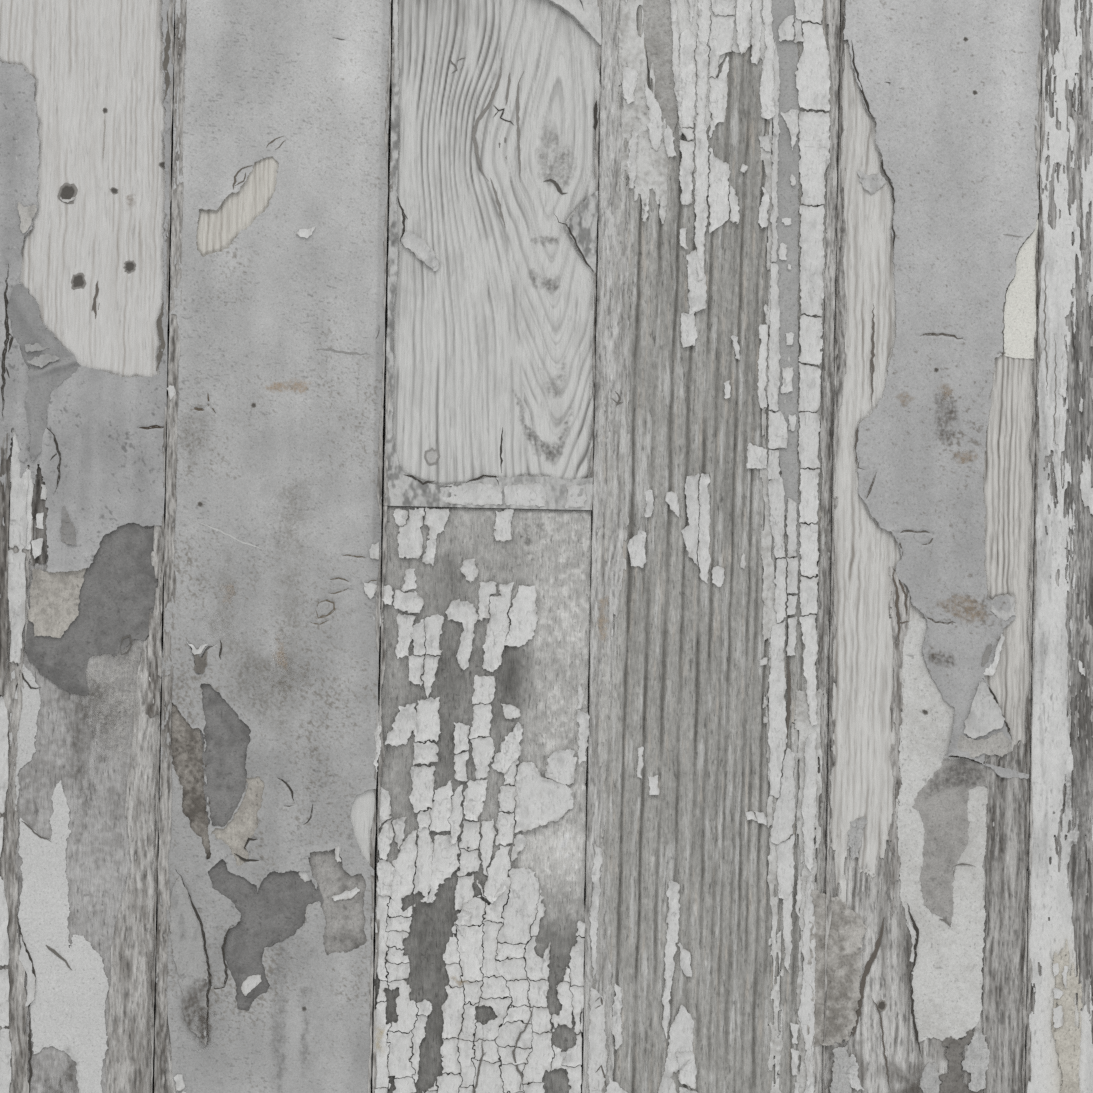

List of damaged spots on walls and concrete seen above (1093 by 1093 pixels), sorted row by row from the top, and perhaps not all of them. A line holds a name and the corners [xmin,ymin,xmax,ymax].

peeling [0,0,170,378]
peeling [0,428,158,1093]
peeling [171,0,627,1093]
crack [472,1037,485,1093]
crack [512,1005,534,1092]
peeling [622,0,1093,1093]